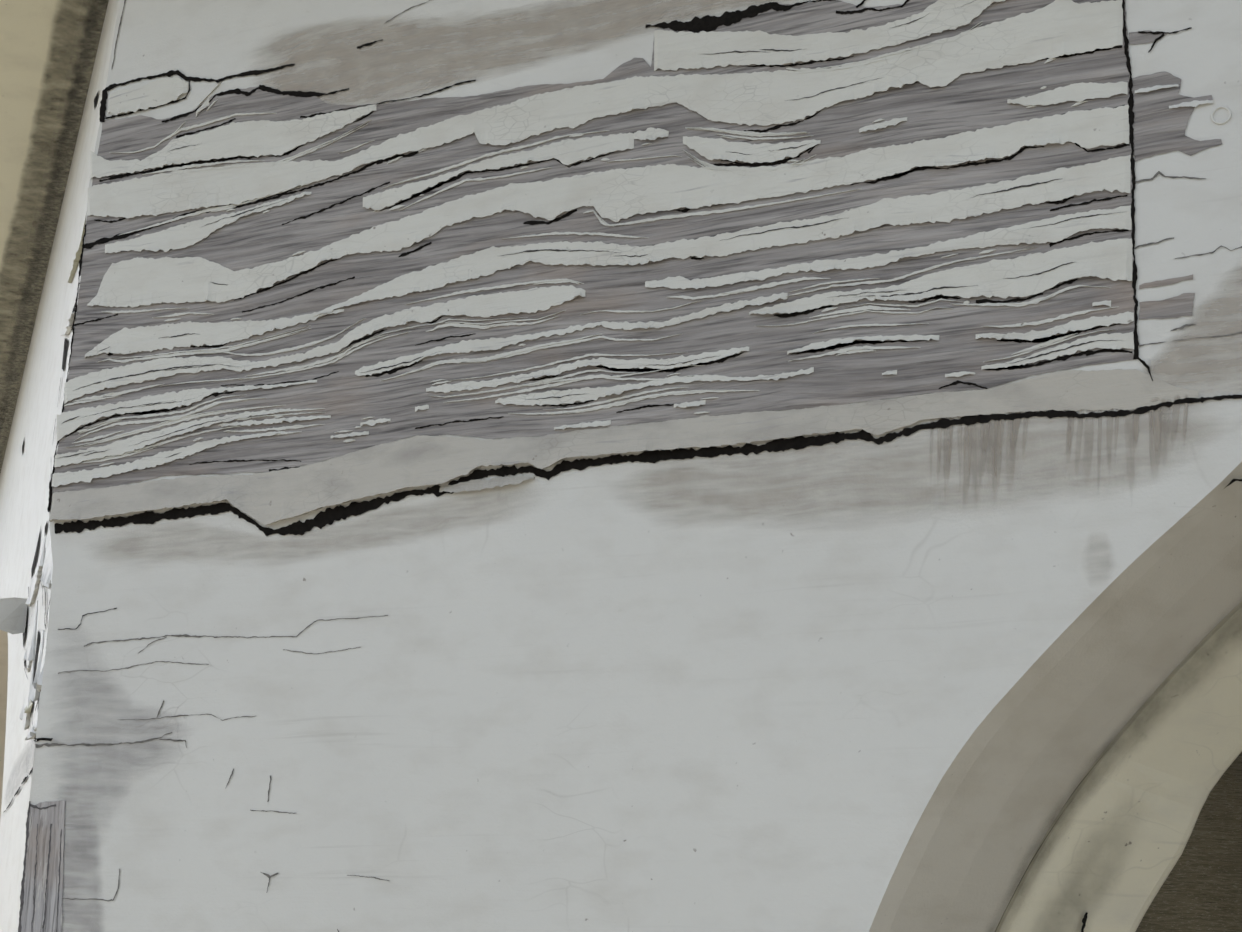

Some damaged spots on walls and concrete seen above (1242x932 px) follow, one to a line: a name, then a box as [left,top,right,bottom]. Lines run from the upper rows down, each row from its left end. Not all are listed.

leakage [272,0,772,102]
leakage [0,0,108,473]
peeling [52,0,1222,493]
crack [43,0,1242,674]
peeling [19,539,53,740]
crack [4,698,255,812]
peeling [18,800,66,932]